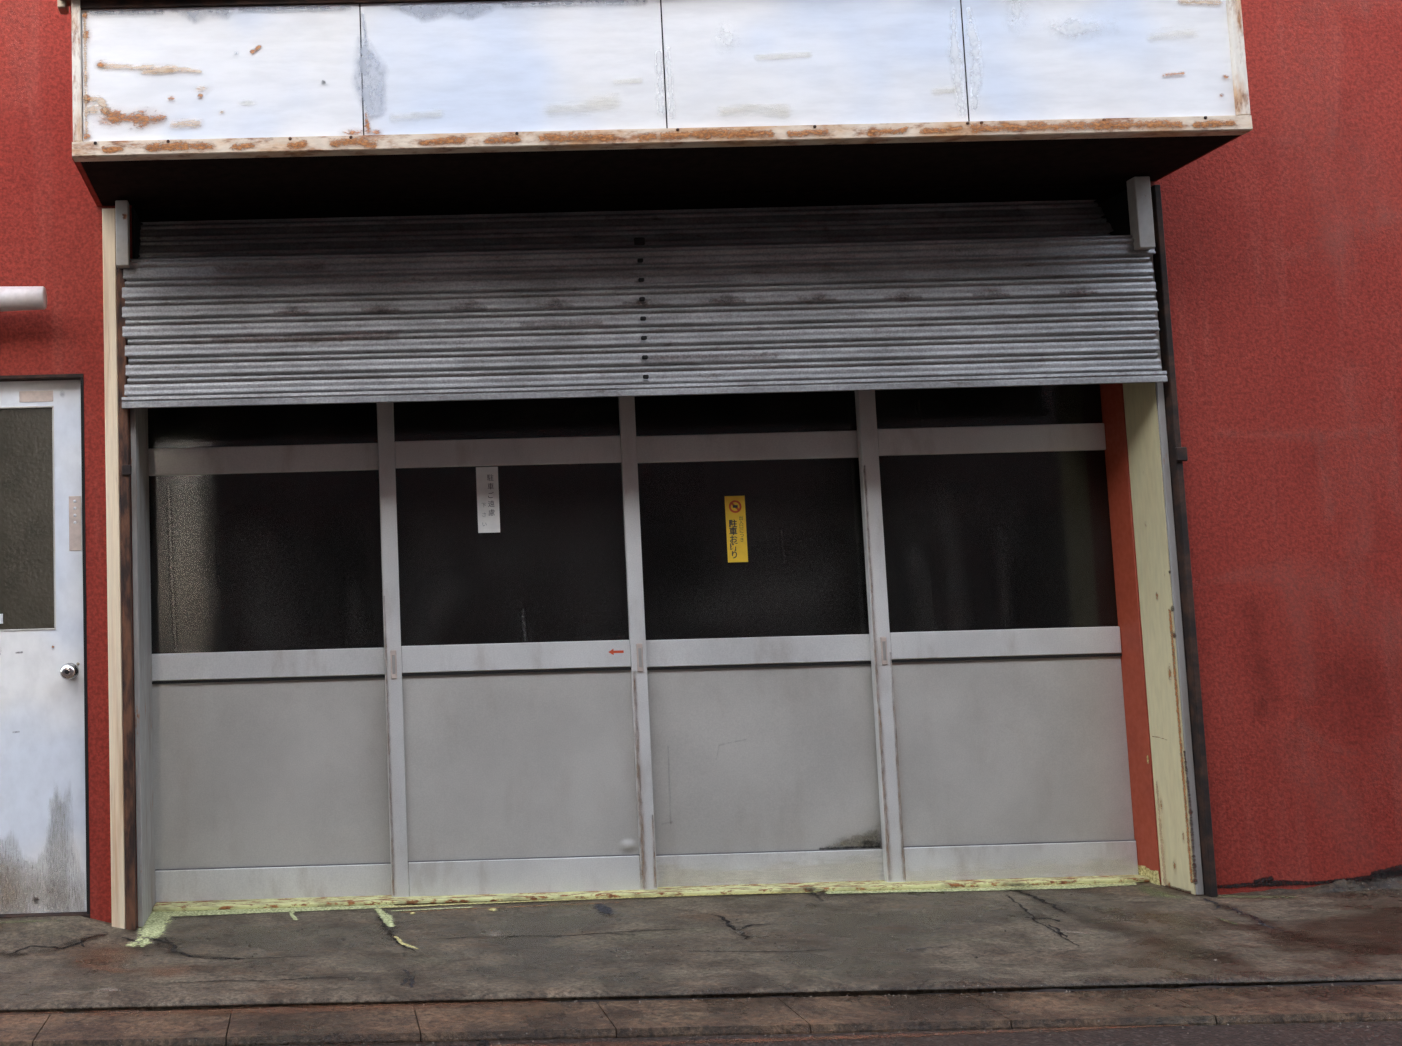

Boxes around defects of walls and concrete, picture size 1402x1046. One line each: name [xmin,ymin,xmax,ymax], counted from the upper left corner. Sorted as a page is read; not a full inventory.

corrosion [82,11,213,153]
corrosion [287,140,307,149]
corrosion [330,113,380,148]
corrosion [418,136,466,145]
corrosion [484,136,521,144]
corrosion [538,132,617,143]
corrosion [638,128,828,142]
corrosion [867,118,1236,136]
crack [1006,890,1079,946]
crack [446,913,836,952]
crack [3,934,356,983]